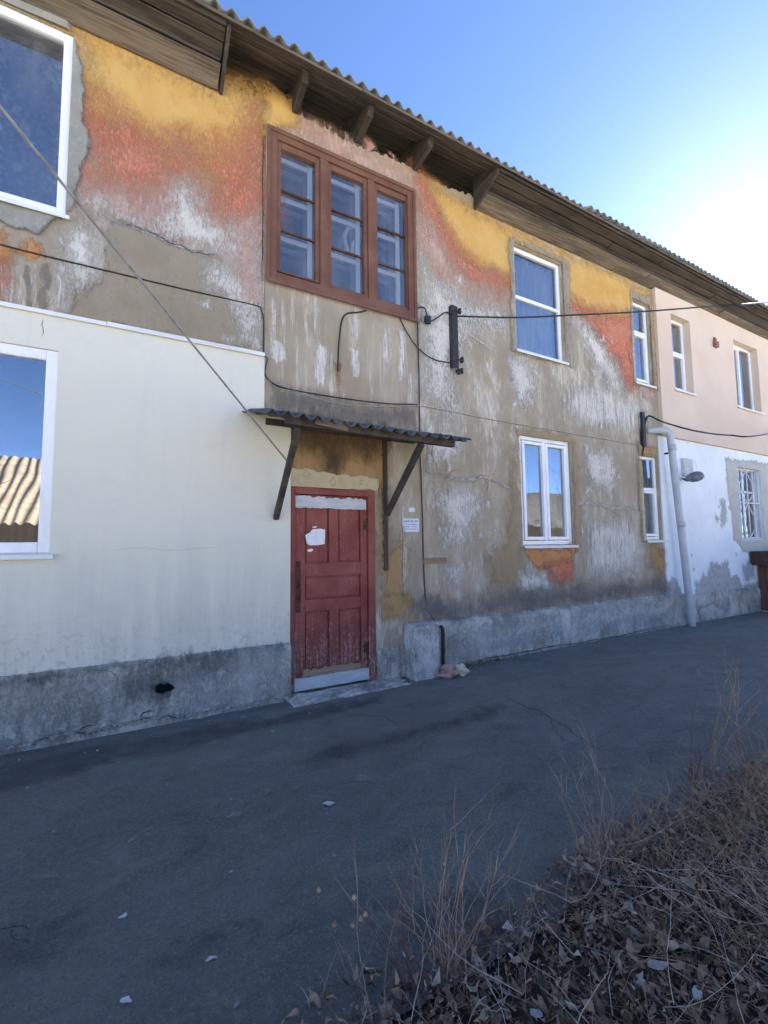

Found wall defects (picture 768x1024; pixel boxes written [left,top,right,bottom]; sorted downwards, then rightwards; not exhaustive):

crack [107,216,218,258]
leakage [268,297,286,364]
peeling [0,19,682,596]
leakage [273,321,415,426]
leakage [414,447,669,620]
peeling [691,554,759,621]